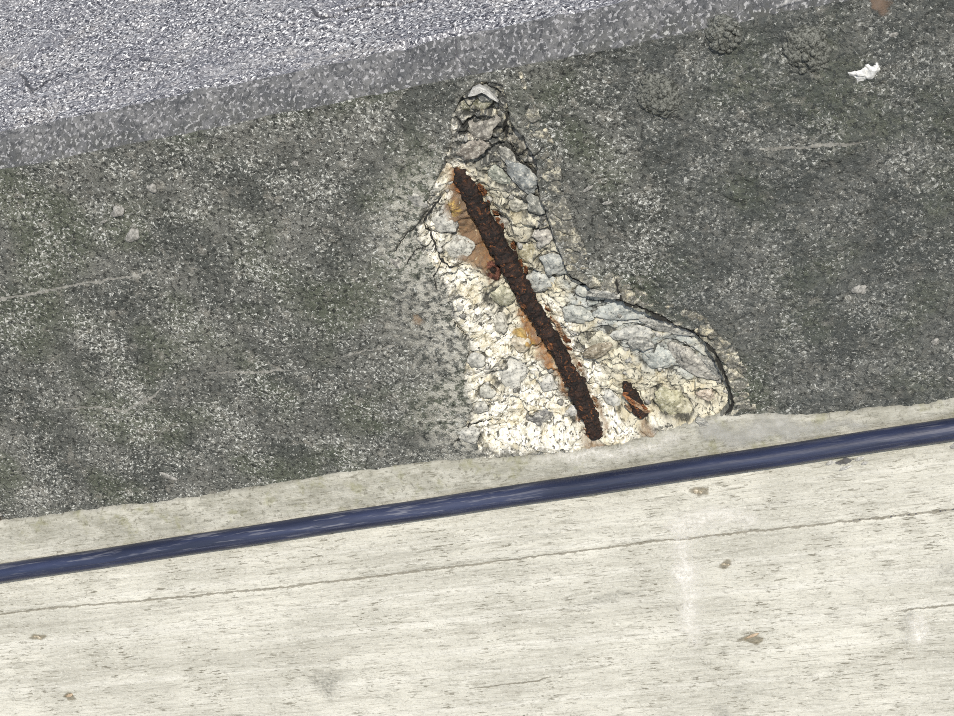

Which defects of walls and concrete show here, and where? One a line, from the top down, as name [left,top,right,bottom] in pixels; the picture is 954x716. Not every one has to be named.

crack [394,191,468,290]
rust [445,167,608,449]
spalling [407,71,756,458]
rust [622,381,654,437]